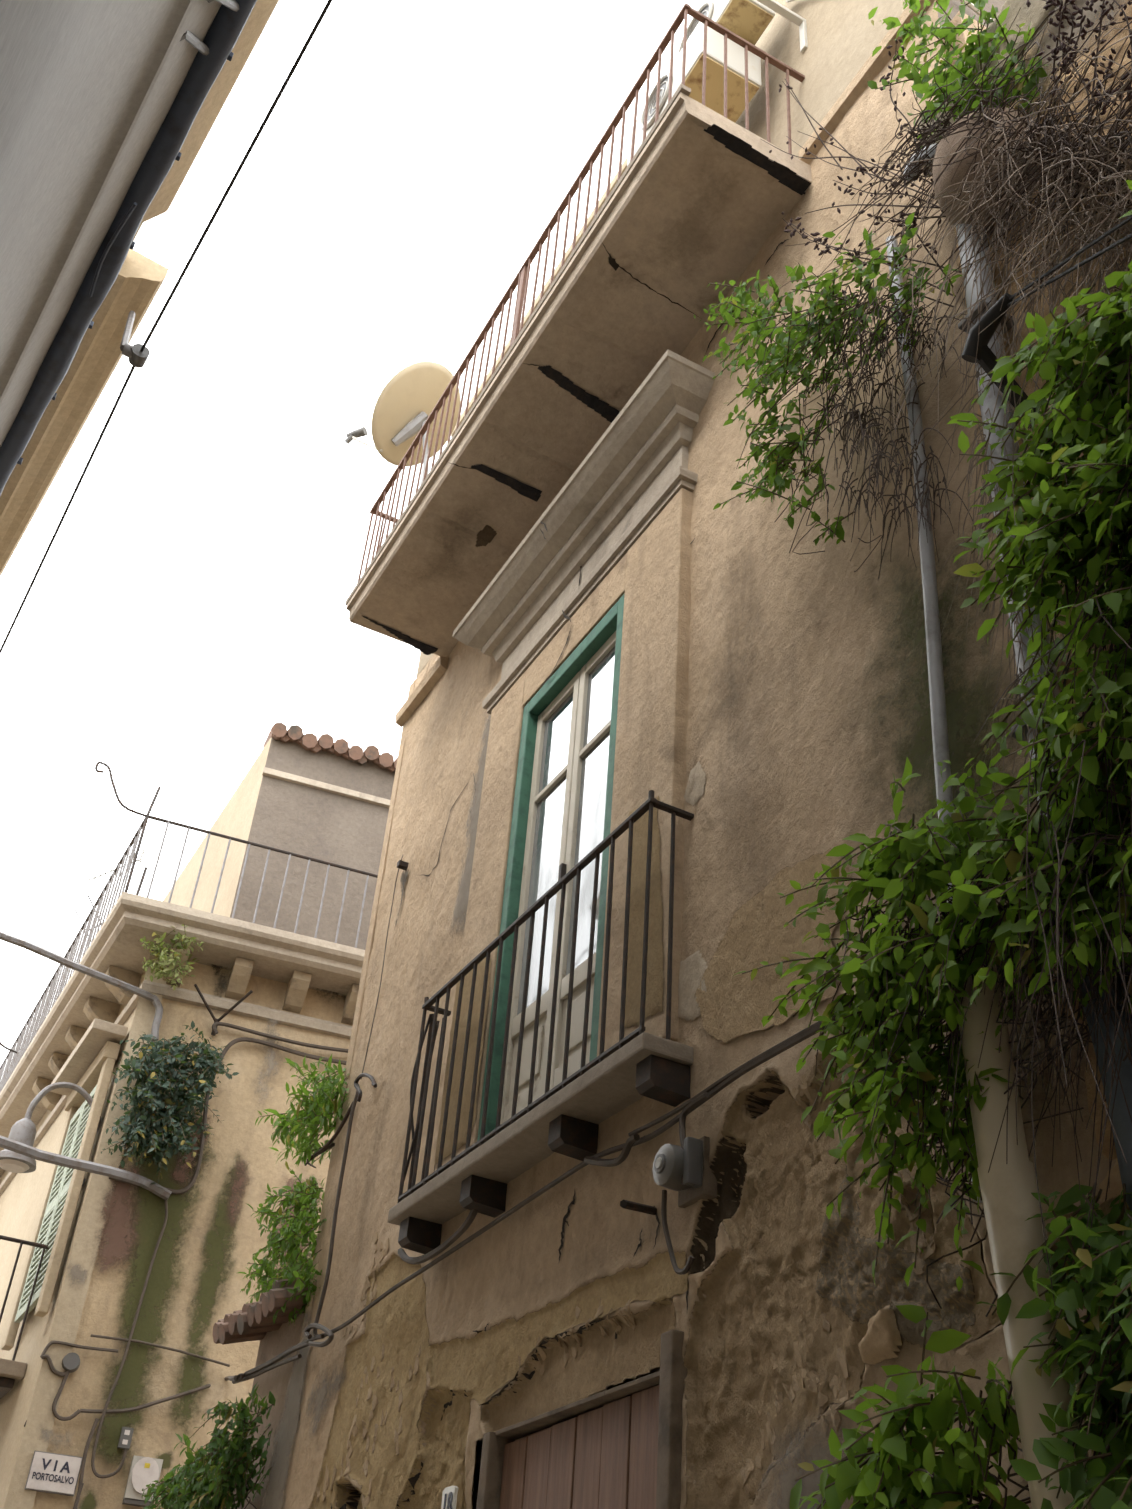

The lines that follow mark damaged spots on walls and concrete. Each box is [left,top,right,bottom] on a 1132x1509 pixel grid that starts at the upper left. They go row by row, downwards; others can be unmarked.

crack [602,243,729,354]
crack [558,1194,575,1261]
flaking render [310,1031,1002,1509]